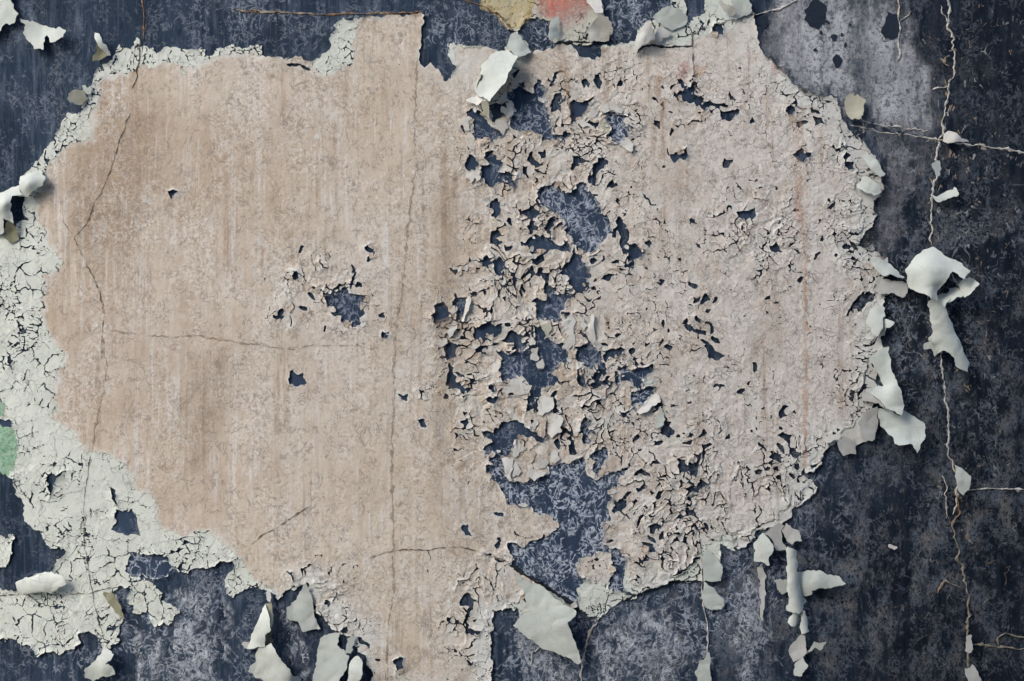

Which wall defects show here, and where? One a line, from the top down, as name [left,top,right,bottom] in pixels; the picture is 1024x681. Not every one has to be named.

peeling [312,18,360,76]
peeling [447,0,769,221]
peeling [804,0,851,68]
crack [850,0,1024,245]
crack [65,115,130,357]
peeling [0,33,387,681]
peeling [398,388,431,401]
peeling [429,67,979,676]
crack [0,457,116,640]
crack [937,351,1024,668]
peeling [393,657,404,675]
peeling [695,652,712,681]